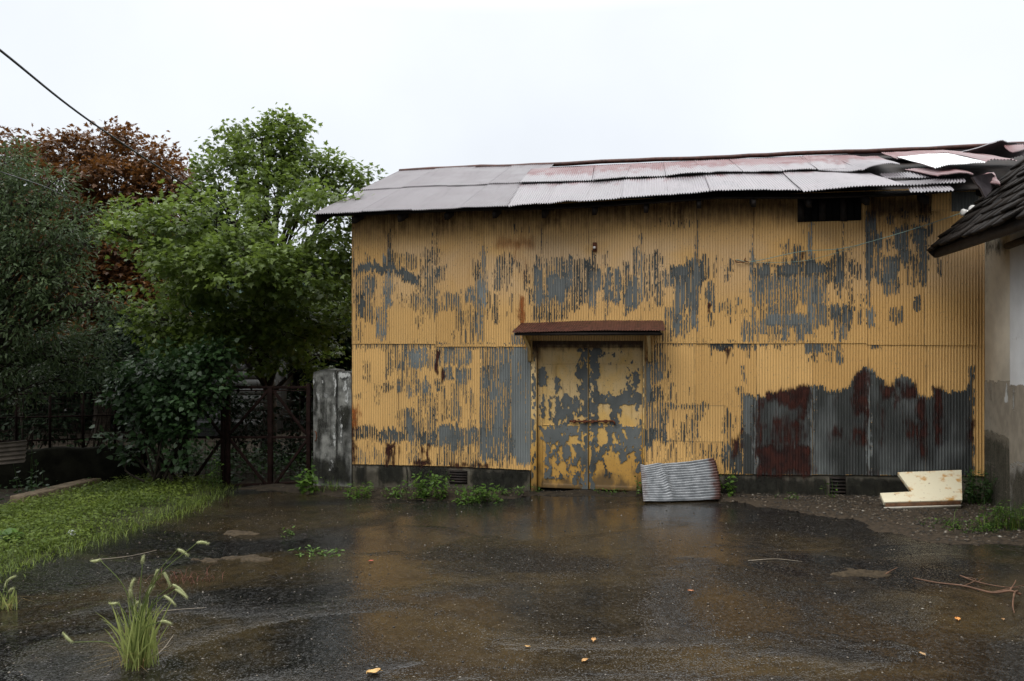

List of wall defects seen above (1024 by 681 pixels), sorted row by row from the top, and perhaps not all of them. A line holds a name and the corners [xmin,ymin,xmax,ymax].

peeling [313,211,1024,516]
water stain [313,383,449,489]
rust [385,442,400,466]
rust [413,444,431,468]
rust [732,385,817,479]
rust [832,369,943,458]
water stain [984,436,1024,523]